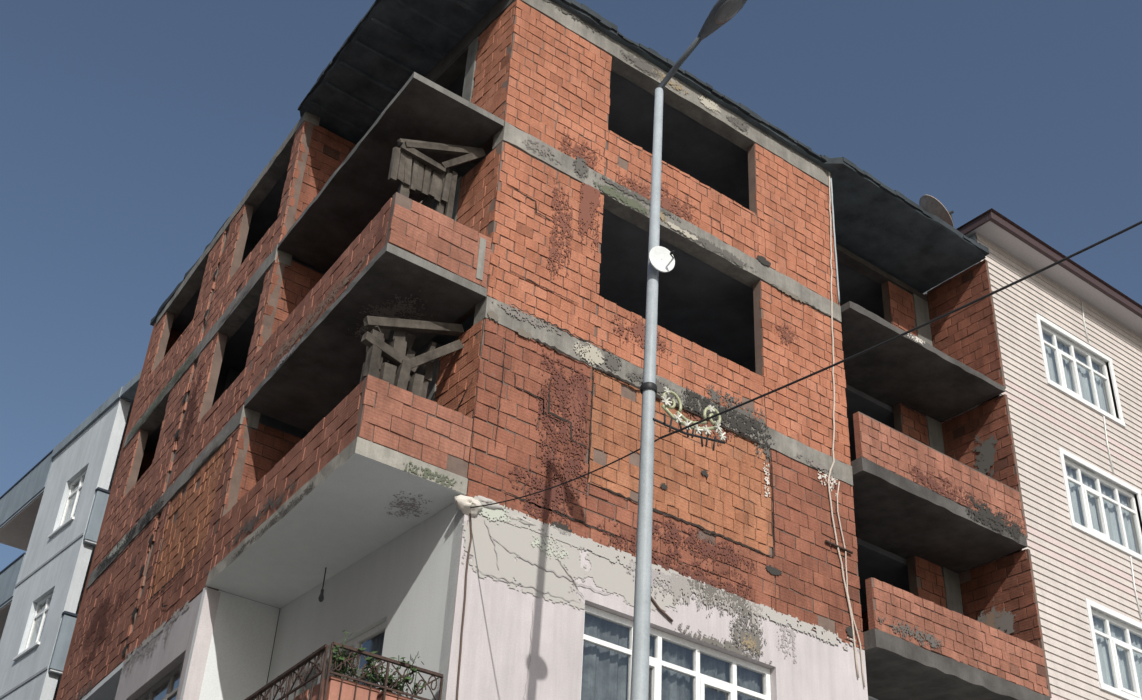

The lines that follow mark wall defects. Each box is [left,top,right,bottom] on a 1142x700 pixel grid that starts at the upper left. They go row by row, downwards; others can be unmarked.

damp [522,126,758,279]
damp [611,313,673,357]
damp [509,341,775,526]
crack [477,520,611,700]
peeling [462,504,636,610]
damp [598,517,637,580]
damp [651,516,797,664]
peeling [650,564,859,650]
damp [910,465,1026,543]
peeling [977,598,1016,634]